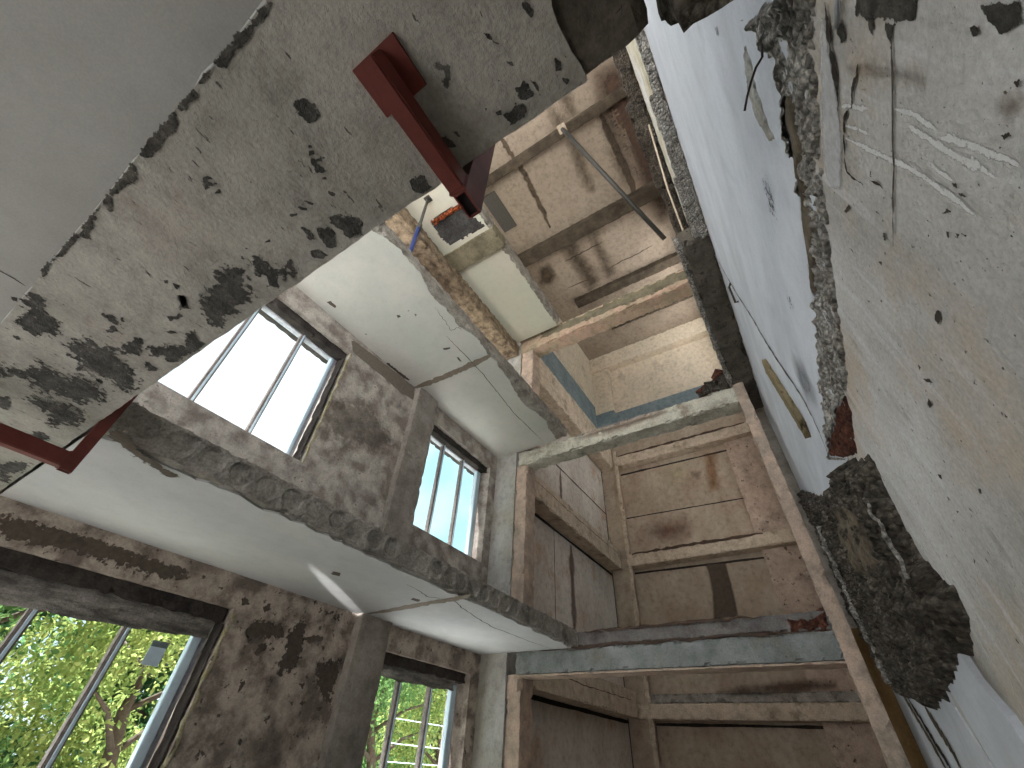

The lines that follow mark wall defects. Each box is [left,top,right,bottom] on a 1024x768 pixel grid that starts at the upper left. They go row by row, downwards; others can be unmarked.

spalling [855,0,916,49]
spalling [970,1,1022,37]
flaking render [743,43,775,141]
spalling [40,2,273,279]
spalling [308,145,335,196]
spalling [290,200,363,259]
spalling [0,248,298,441]
crack [439,314,532,431]
spalling [797,396,974,710]
flaking render [246,603,323,677]
flaking render [787,606,831,632]
flaking render [290,657,342,711]